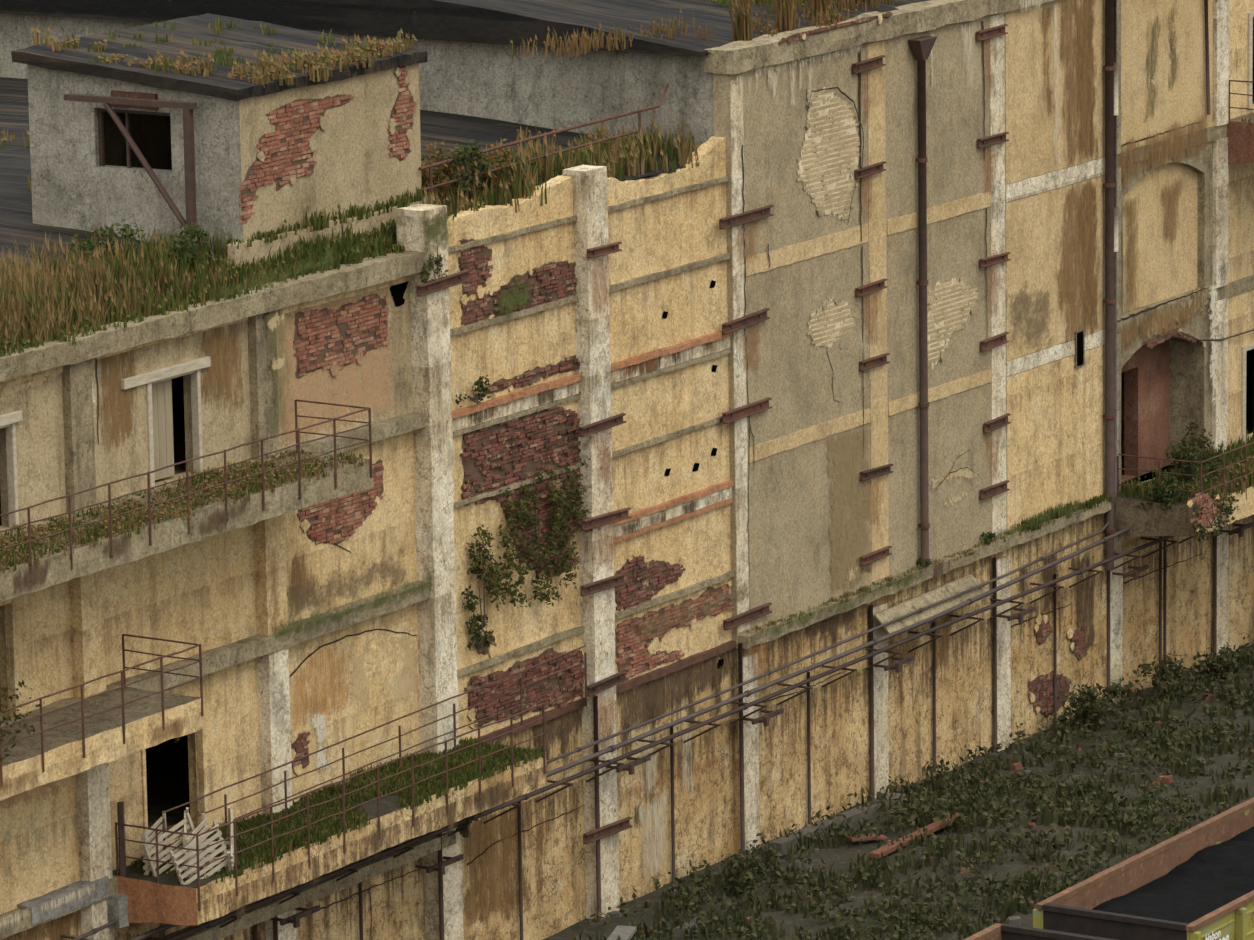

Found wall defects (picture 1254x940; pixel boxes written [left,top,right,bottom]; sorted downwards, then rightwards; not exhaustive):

water stain [1020,0,1098,164]
water stain [1146,13,1177,116]
flaking render [238,94,355,224]
flaking render [797,87,863,220]
flaking render [268,281,408,440]
flaking render [458,239,578,327]
flaking render [927,276,979,370]
water stain [1012,182,1099,344]
flaking render [298,460,384,545]
flaking render [460,406,581,578]
crack [290,629,417,677]
flaking render [614,554,733,684]